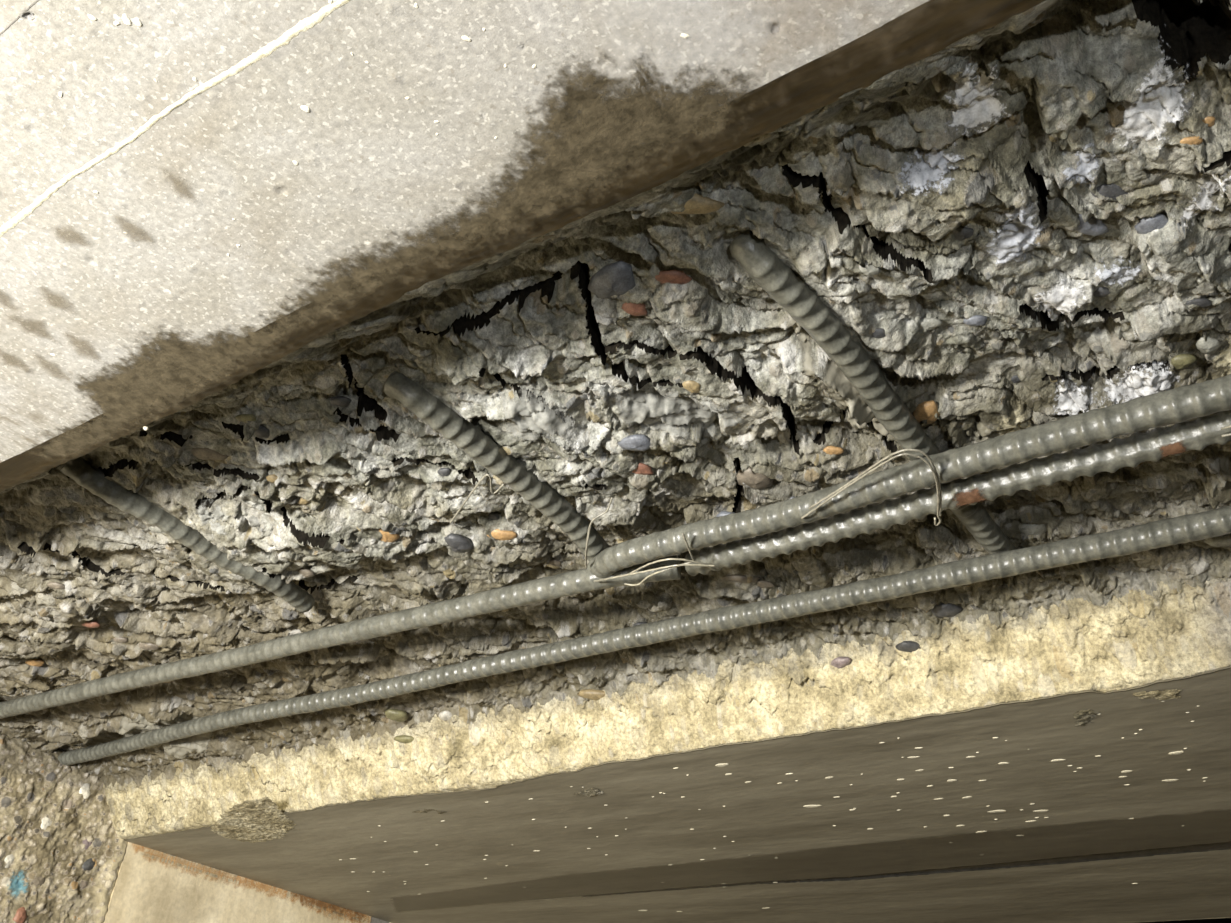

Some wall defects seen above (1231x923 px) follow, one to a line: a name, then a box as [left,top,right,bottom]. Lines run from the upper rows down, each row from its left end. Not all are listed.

leakage [899,55,1011,196]
leakage [1106,40,1194,149]
leakage [32,56,752,459]
crack [333,354,478,485]
spalling [0,0,1231,719]
crack [414,260,898,457]
crack [782,164,934,283]
leakage [986,202,1043,264]
leakage [1034,278,1087,319]
leakage [1053,360,1180,415]
leakage [1177,172,1231,226]
spalling [0,374,1231,923]